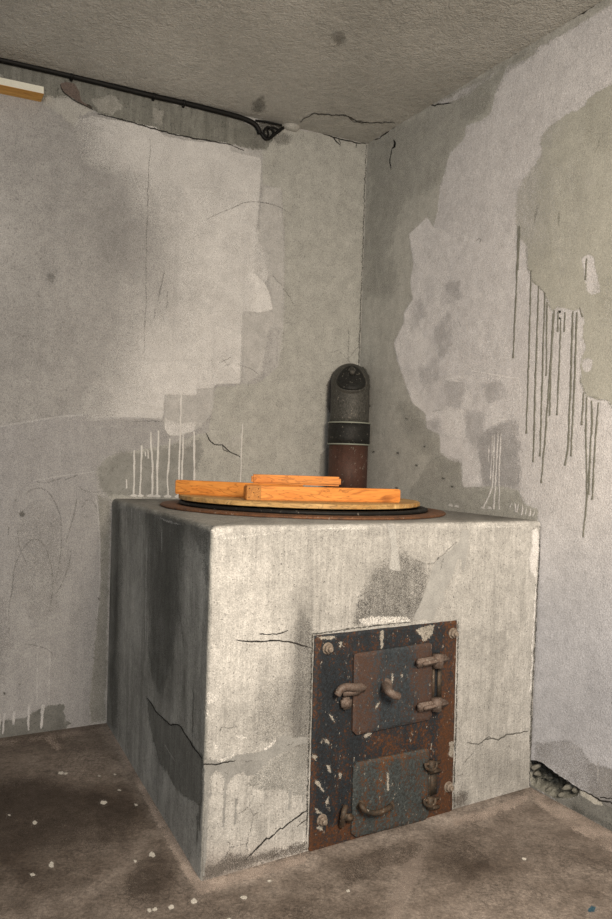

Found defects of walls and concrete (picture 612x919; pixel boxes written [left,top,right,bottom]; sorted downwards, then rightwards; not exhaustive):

flaking render [0,47,539,521]
crack [300,113,396,364]
damp [477,82,612,537]
crack [147,687,252,774]
crack [225,622,411,860]
crack [453,526,541,802]
spalling [530,760,584,799]
crack [579,789,612,803]